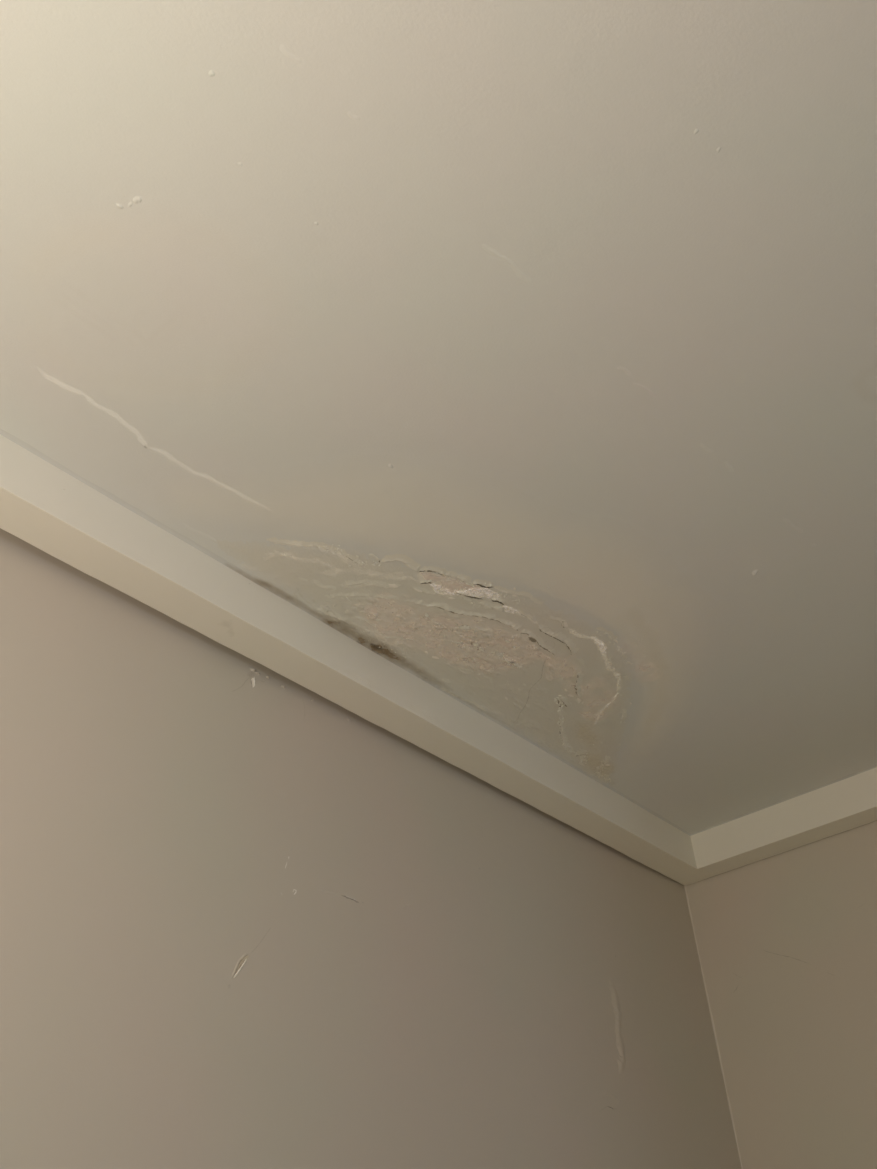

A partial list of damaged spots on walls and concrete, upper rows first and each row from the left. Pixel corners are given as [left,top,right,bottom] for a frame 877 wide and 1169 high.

peeling [212,537,635,783]